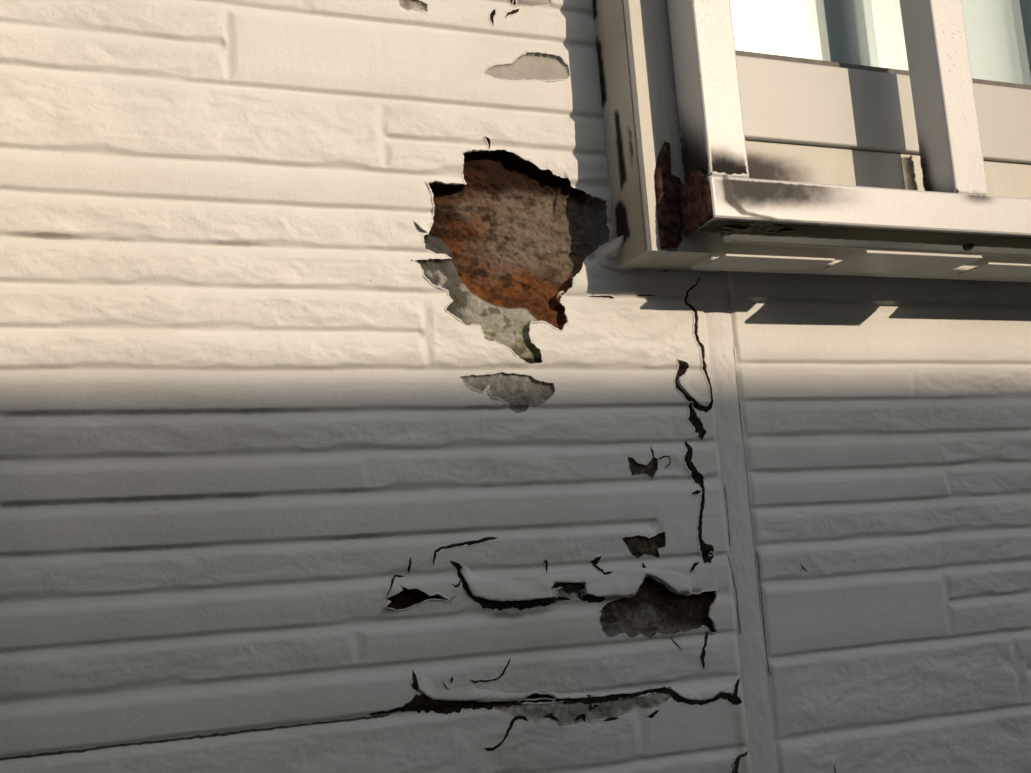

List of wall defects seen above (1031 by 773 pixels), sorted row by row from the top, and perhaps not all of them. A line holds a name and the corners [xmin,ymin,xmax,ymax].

peeling [398,0,428,13]
peeling [511,0,553,8]
peeling [484,51,571,83]
spalling [410,148,612,414]
crack [587,270,657,301]
peeling [627,456,659,481]
crack [650,275,770,673]
crack [386,535,614,611]
spalling [460,530,718,640]
crack [0,657,742,761]
crack [730,749,749,773]